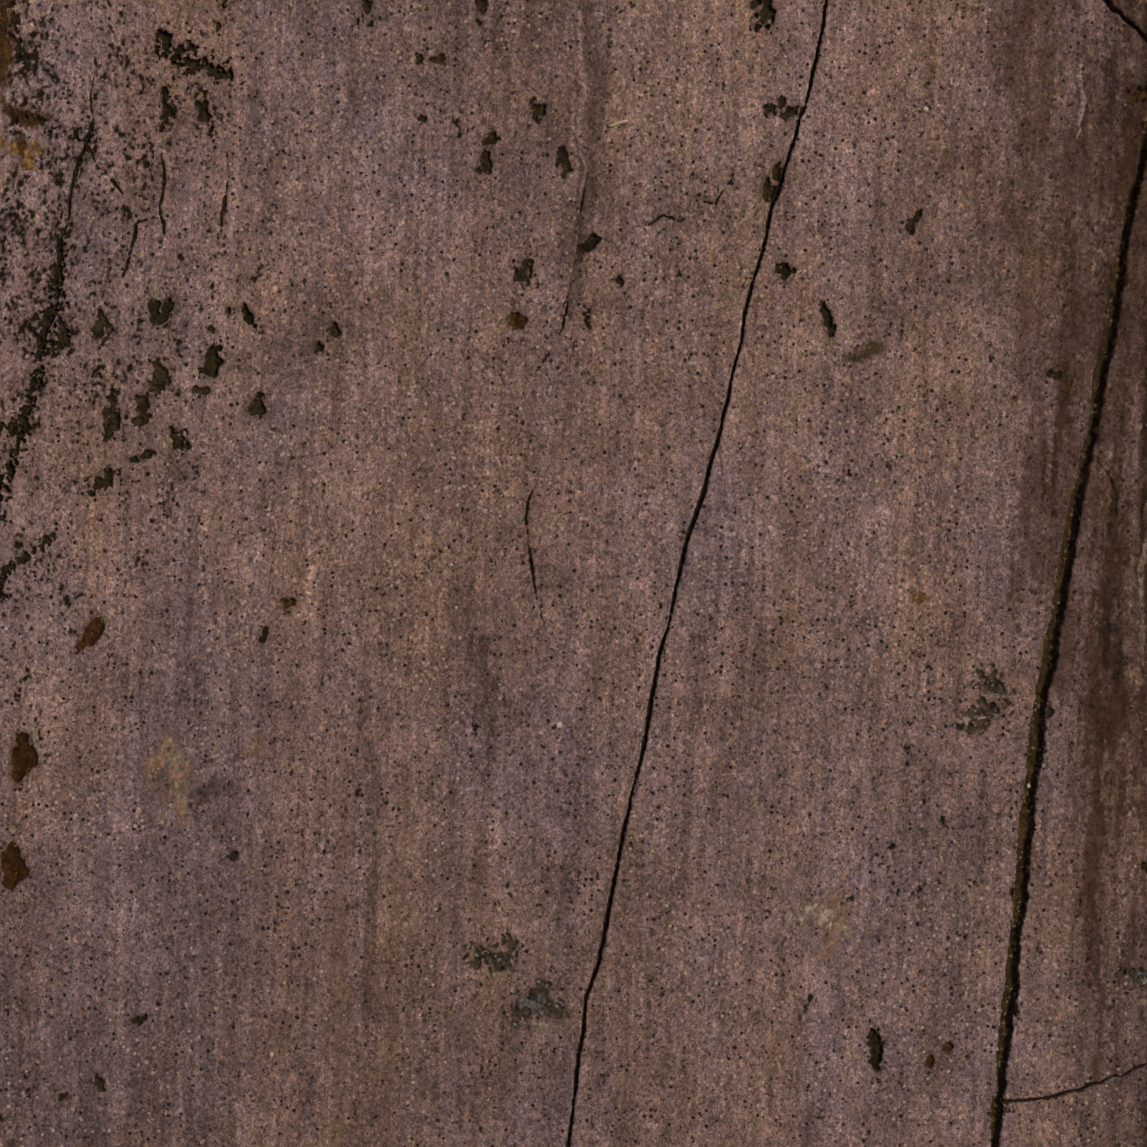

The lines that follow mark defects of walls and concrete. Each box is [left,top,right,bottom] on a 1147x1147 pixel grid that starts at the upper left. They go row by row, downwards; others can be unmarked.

crack [1103,0,1147,44]
spalling [151,29,234,143]
spalling [475,129,501,183]
spalling [555,146,572,179]
leakage [1103,0,1147,345]
spalling [147,297,177,326]
spalling [224,303,257,328]
spalling [101,325,224,442]
spalling [84,449,156,497]
crack [566,0,828,1147]
crack [990,115,1147,1147]
leakage [1075,322,1147,1080]